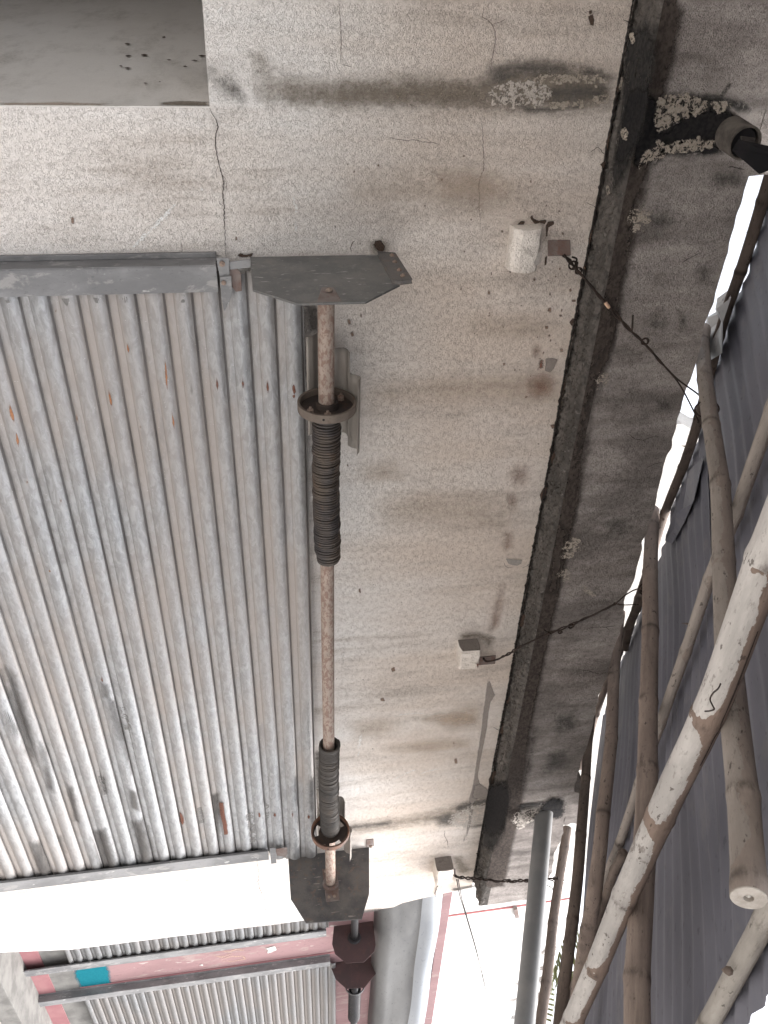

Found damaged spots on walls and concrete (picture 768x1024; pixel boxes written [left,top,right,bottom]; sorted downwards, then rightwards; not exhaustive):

water stain [271,63,607,111]
crack [210,109,227,253]
water stain [353,0,749,888]